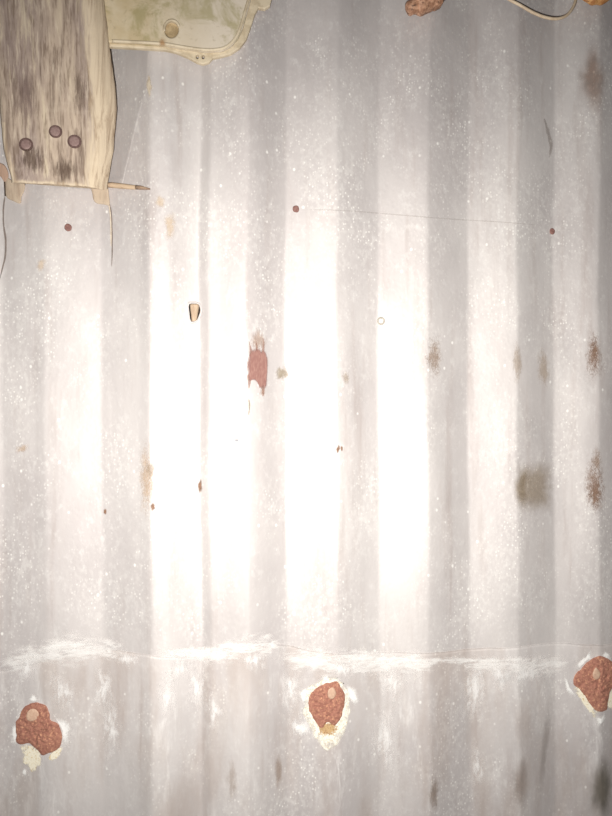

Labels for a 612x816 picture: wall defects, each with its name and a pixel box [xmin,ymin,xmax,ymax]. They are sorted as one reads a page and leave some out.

corrosion [248,350,267,388]
corrosion [589,475,600,502]
corrosion [12,696,70,775]
damp [4,638,135,677]
corrosion [296,676,357,750]
corrosion [565,652,612,725]